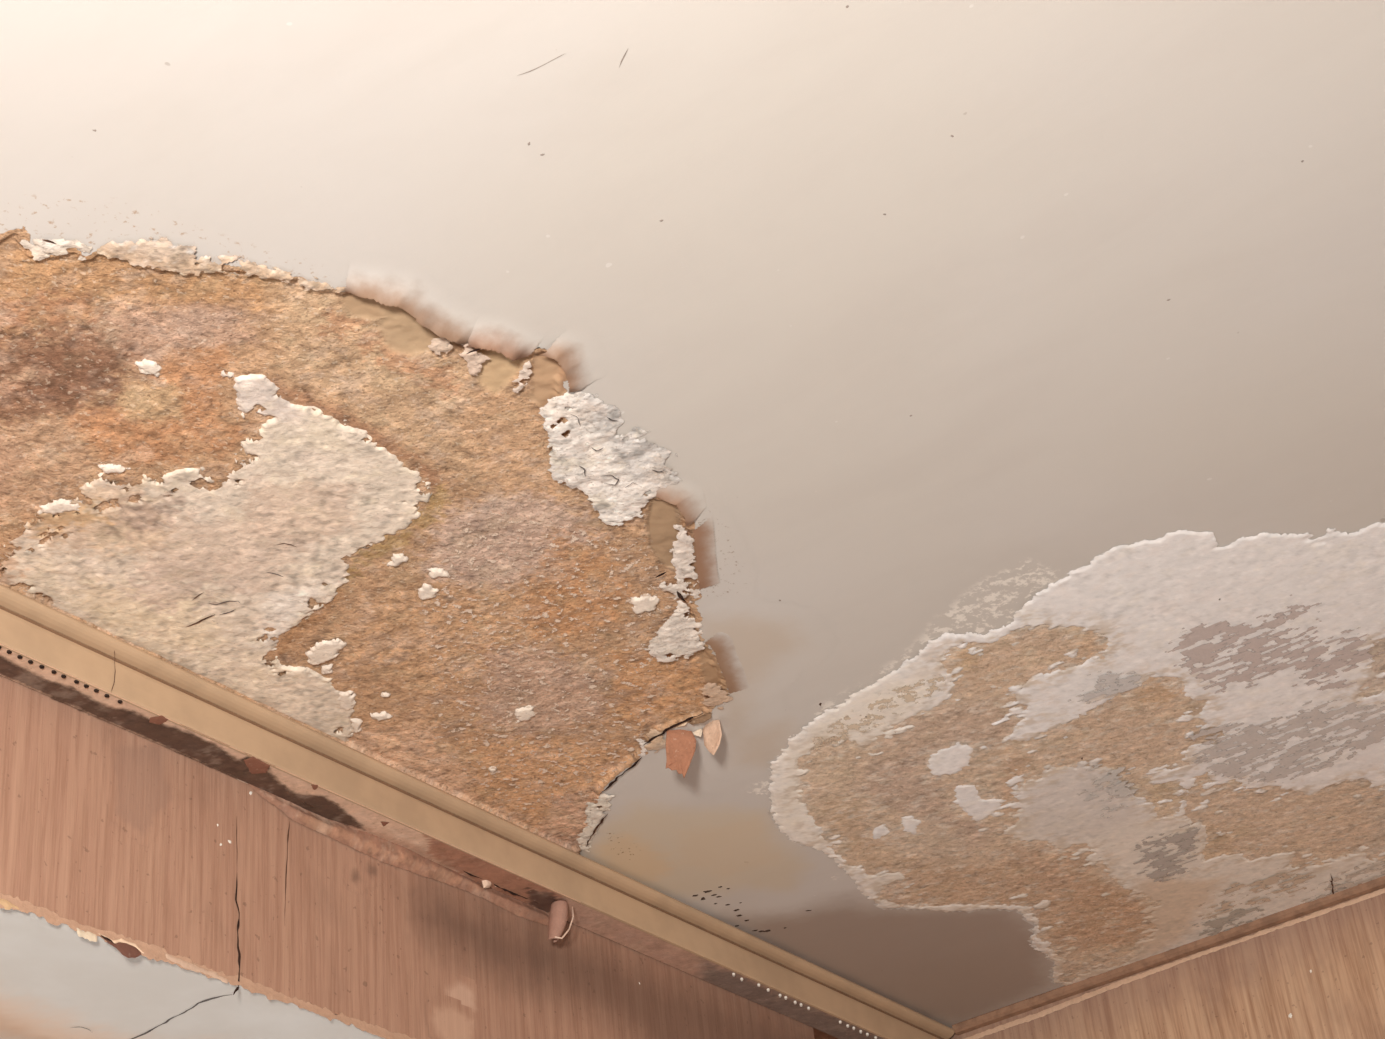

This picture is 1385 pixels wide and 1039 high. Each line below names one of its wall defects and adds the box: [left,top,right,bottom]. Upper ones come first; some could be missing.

flaking render [0,185,759,854]
crack [132,879,241,1039]
crack [283,821,291,902]
peeling [737,522,1385,1039]